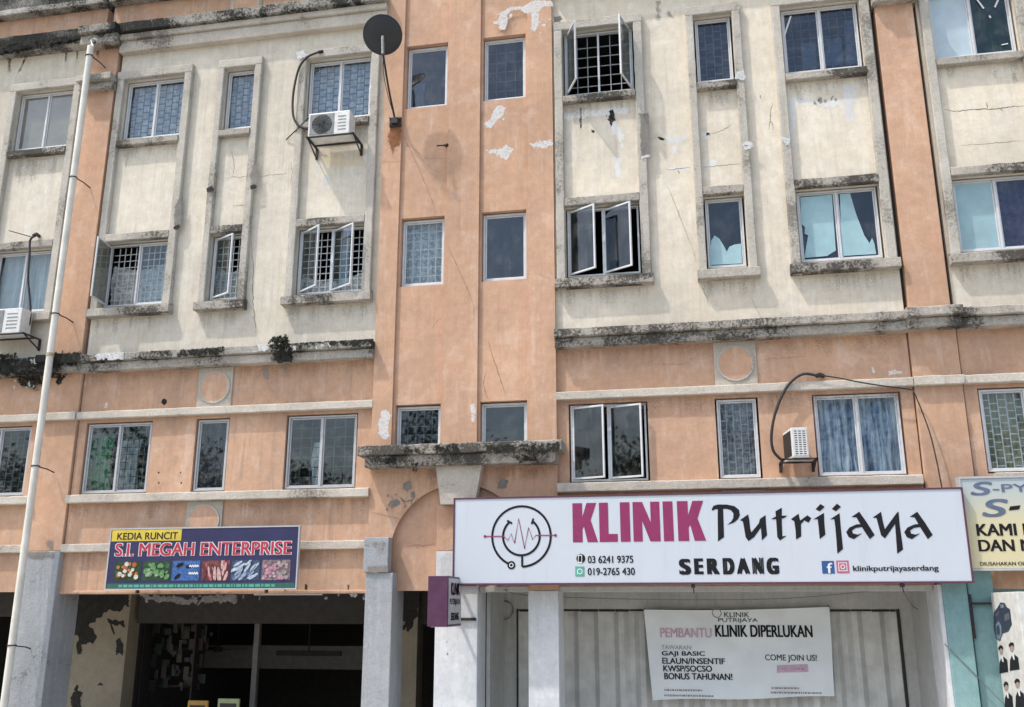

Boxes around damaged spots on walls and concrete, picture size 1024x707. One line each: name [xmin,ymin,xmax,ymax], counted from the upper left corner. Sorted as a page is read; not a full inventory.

peeling [493,0,563,33]
peeling [484,105,506,128]
crack [945,104,1020,112]
crack [448,247,506,398]
leakage [0,351,82,391]
leakage [177,346,225,358]
leakage [234,339,374,390]
peeling [378,410,391,439]
leakage [374,444,460,486]
leakage [485,442,560,485]
peeling [75,592,244,655]
peeling [70,685,83,707]